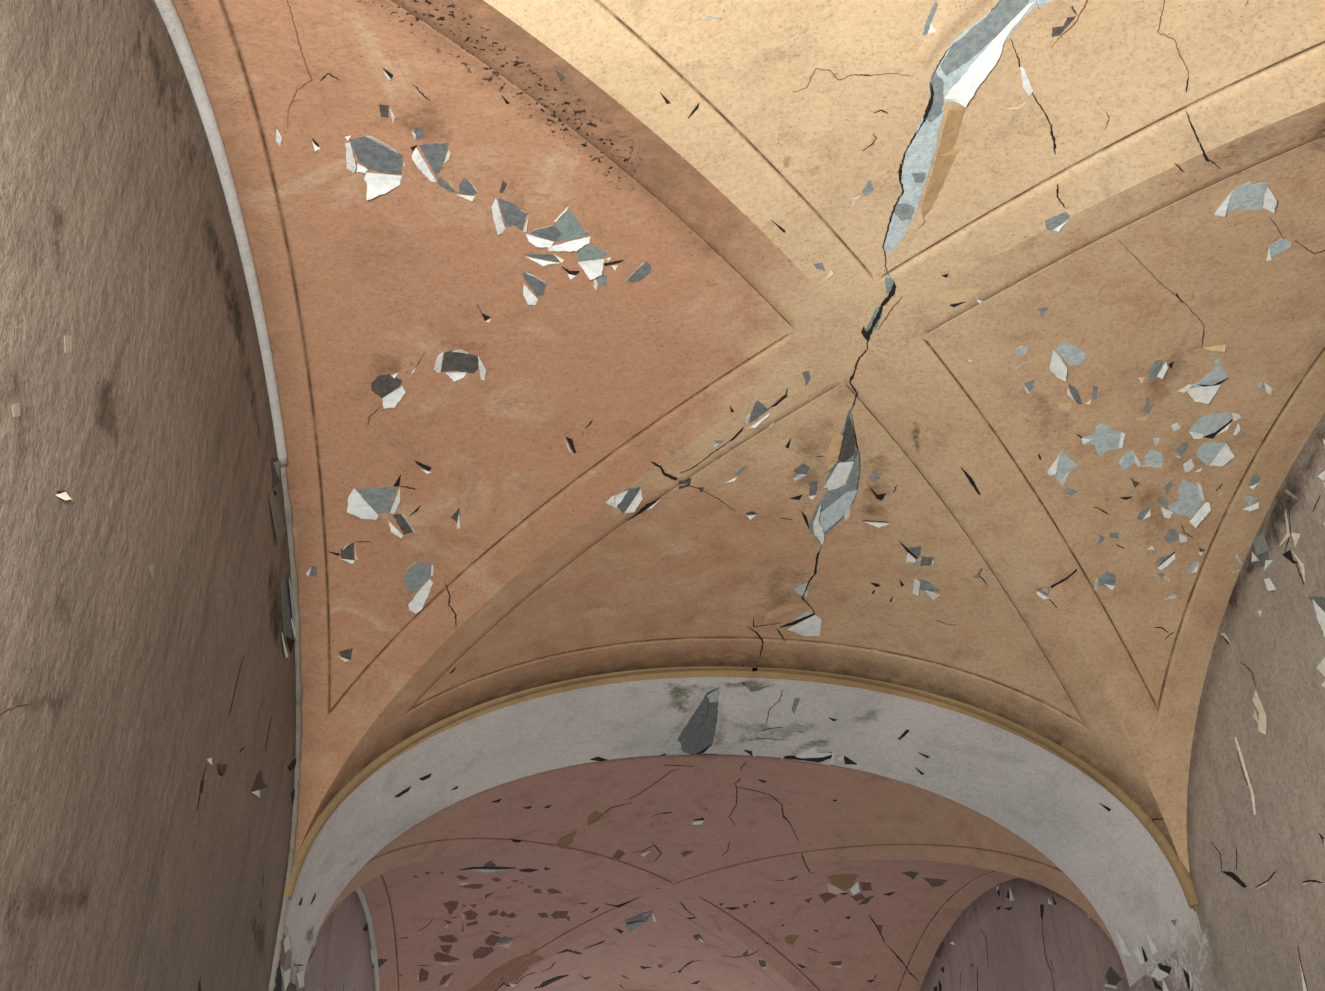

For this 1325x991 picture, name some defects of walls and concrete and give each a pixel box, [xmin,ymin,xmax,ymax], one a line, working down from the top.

damp [373,0,633,182]
peeling [345,126,478,201]
peeling [491,181,652,305]
peeling [347,475,421,538]
peeling [404,562,434,614]
peeling [368,349,486,424]
crack [721,0,1065,874]
peeling [1049,343,1098,410]
peeling [1077,330,1242,601]
peeling [1232,489,1325,637]
spalling [660,687,719,756]
peeling [398,860,656,991]